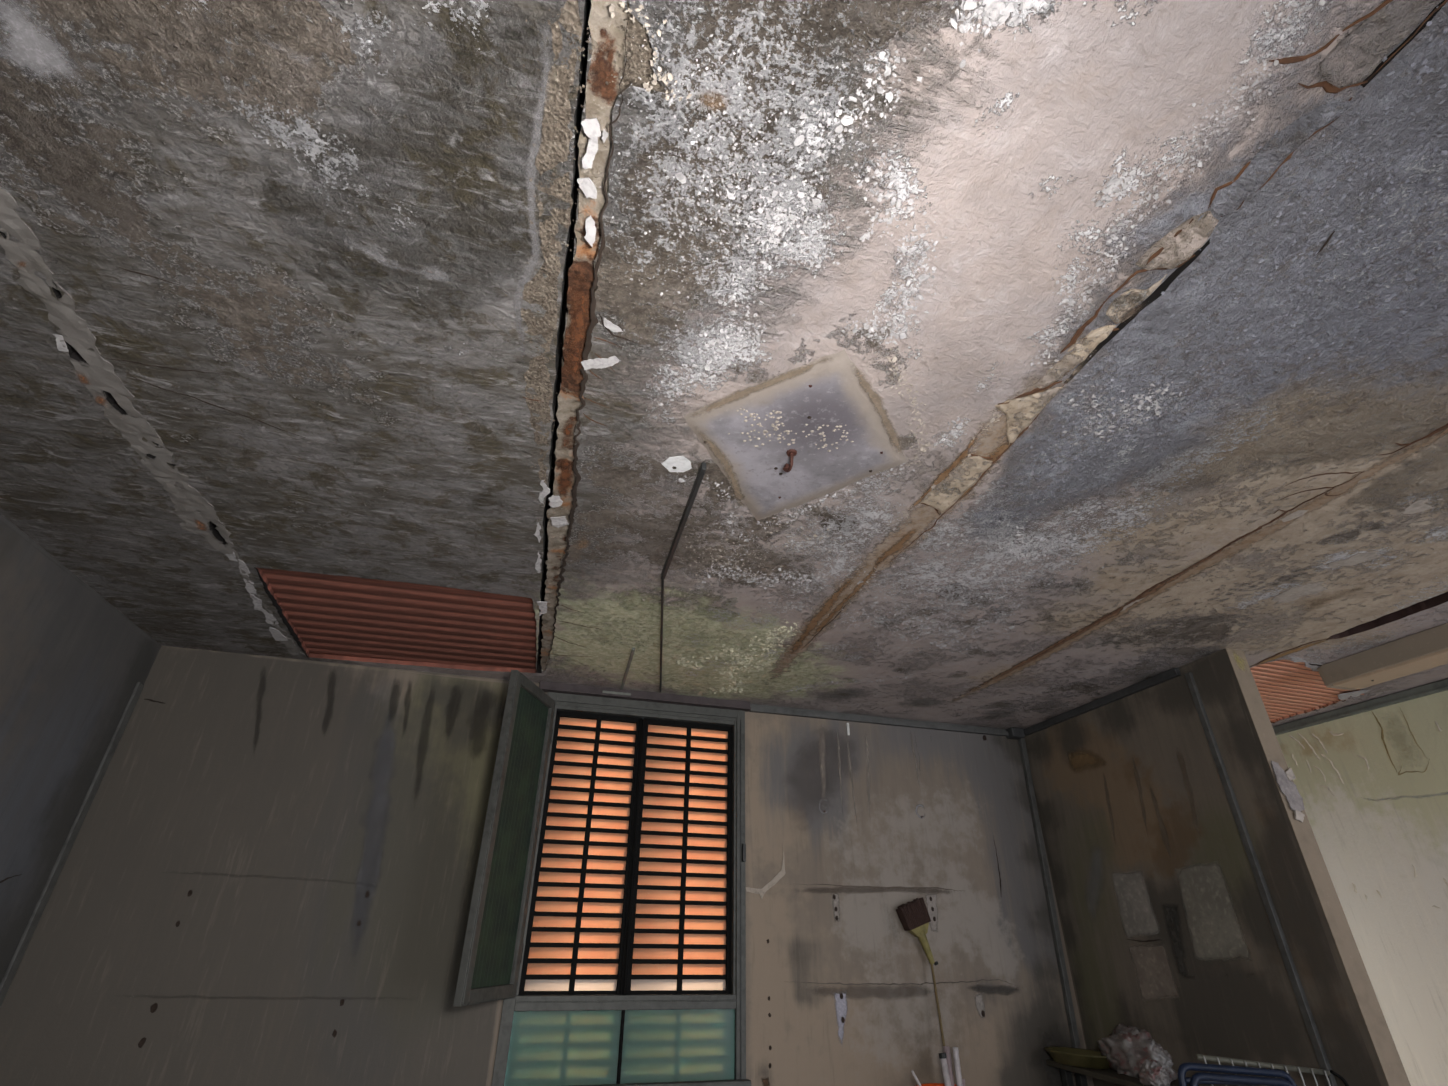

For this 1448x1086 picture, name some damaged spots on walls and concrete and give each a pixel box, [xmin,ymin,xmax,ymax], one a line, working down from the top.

crack [523,0,638,673]
peeling [505,0,1446,664]
crack [882,0,1448,568]
crack [1015,423,1448,668]